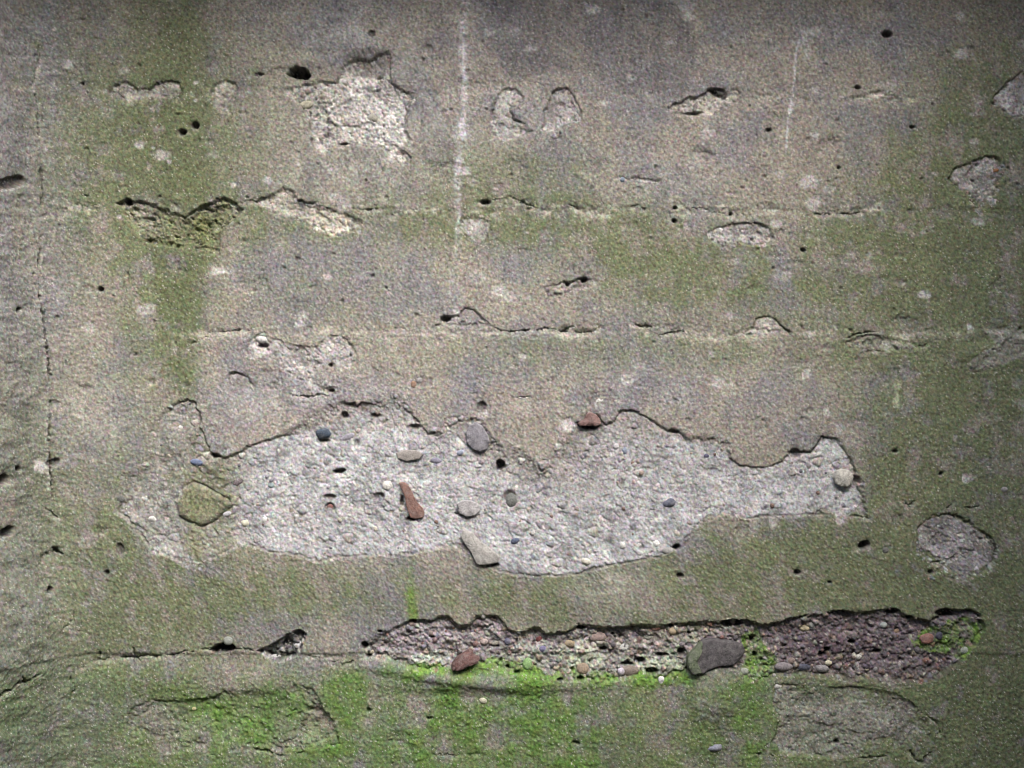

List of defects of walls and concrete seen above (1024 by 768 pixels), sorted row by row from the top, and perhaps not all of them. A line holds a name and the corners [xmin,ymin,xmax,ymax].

spalling [283,50,416,169]
spalling [665,87,743,122]
spalling [115,196,237,250]
spalling [255,185,371,239]
crack [509,324,592,335]
spalling [113,331,870,579]
crack [133,647,191,664]
crack [0,677,27,698]
crack [69,674,78,702]
leakage [0,657,158,768]
leakage [638,687,682,758]
spalling [364,607,987,761]